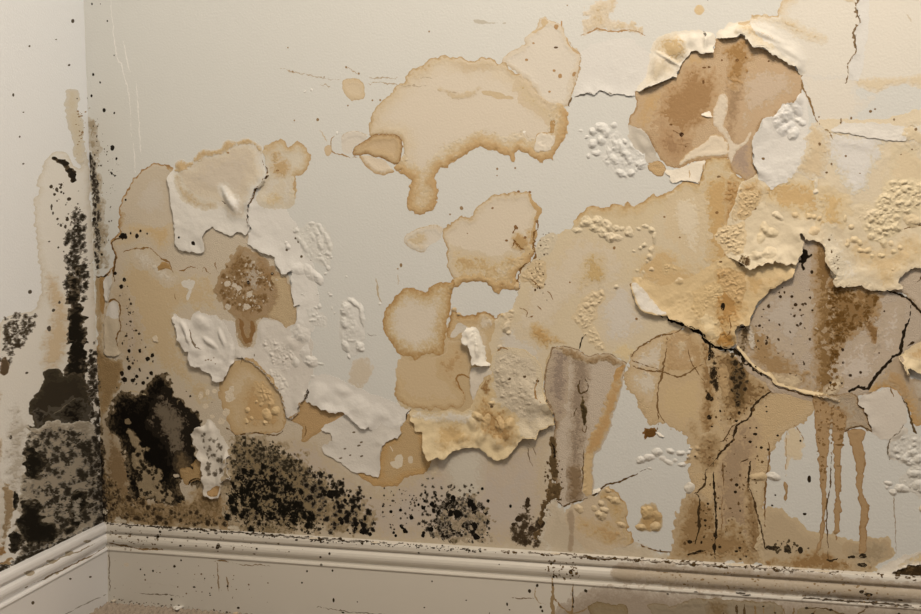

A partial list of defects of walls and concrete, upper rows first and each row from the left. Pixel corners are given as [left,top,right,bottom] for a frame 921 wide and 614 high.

damp [322,17,581,215]
damp [749,0,921,181]
crack [845,0,861,84]
damp [0,89,497,567]
peeling [97,35,921,564]
damp [382,157,745,413]
crack [542,426,646,507]
crack [631,315,813,558]
crack [826,277,921,562]